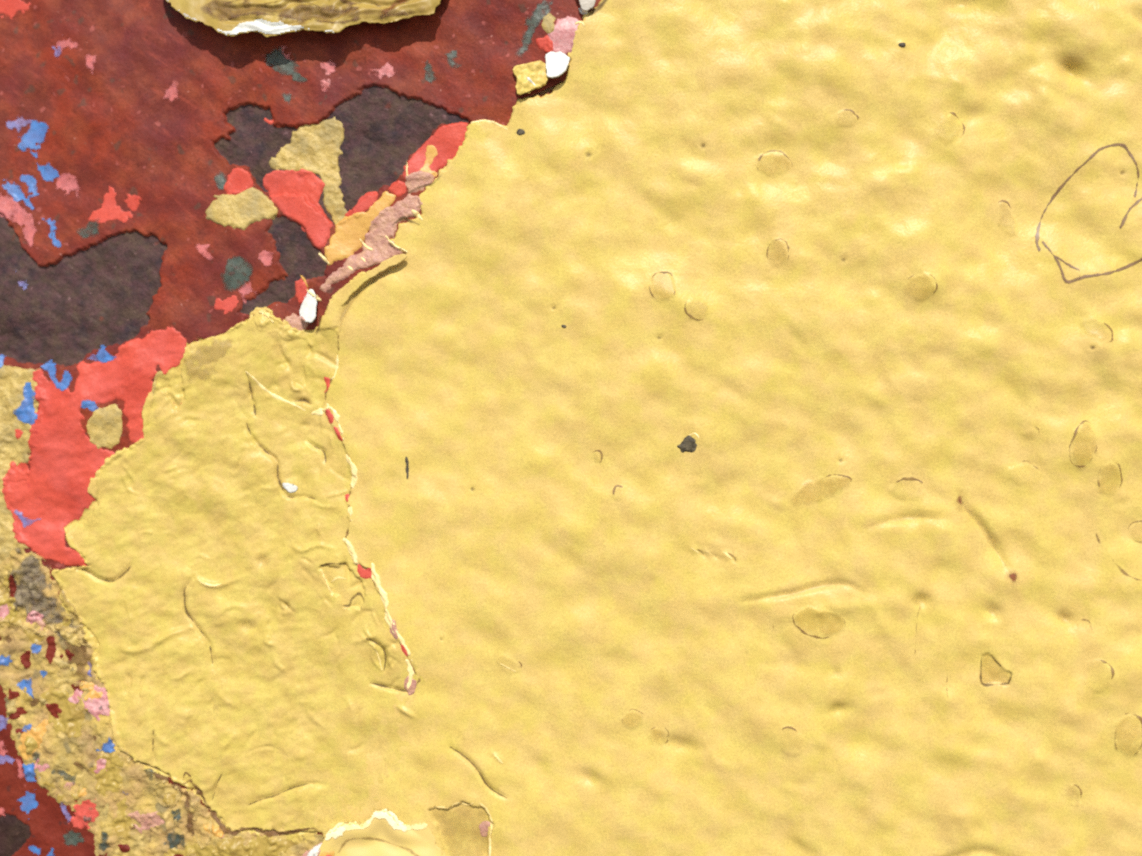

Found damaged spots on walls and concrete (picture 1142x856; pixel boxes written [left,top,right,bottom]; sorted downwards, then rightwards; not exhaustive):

peeling [0,0,606,856]